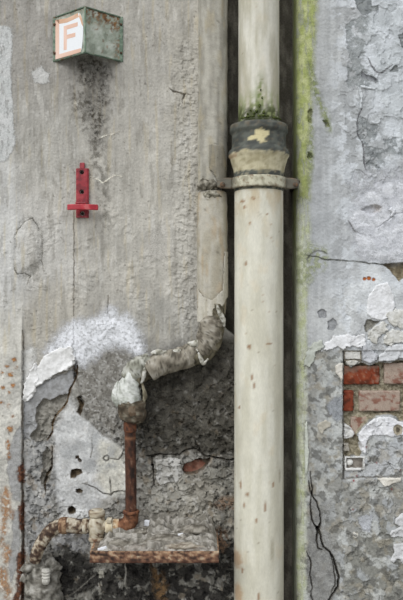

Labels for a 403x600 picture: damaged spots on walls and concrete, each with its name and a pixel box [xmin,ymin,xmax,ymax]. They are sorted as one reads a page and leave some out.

mould [74,56,112,142]
crack [357,109,367,170]
water stain [296,0,329,406]
crack [307,250,384,265]
efflorescence [43,306,146,367]
flaking render [303,282,403,458]
corrosion [0,487,25,600]
corrosion [17,464,25,483]
spalling [7,343,133,581]
flaking render [155,457,234,488]
water stain [296,415,305,600]
crack [306,473,340,600]